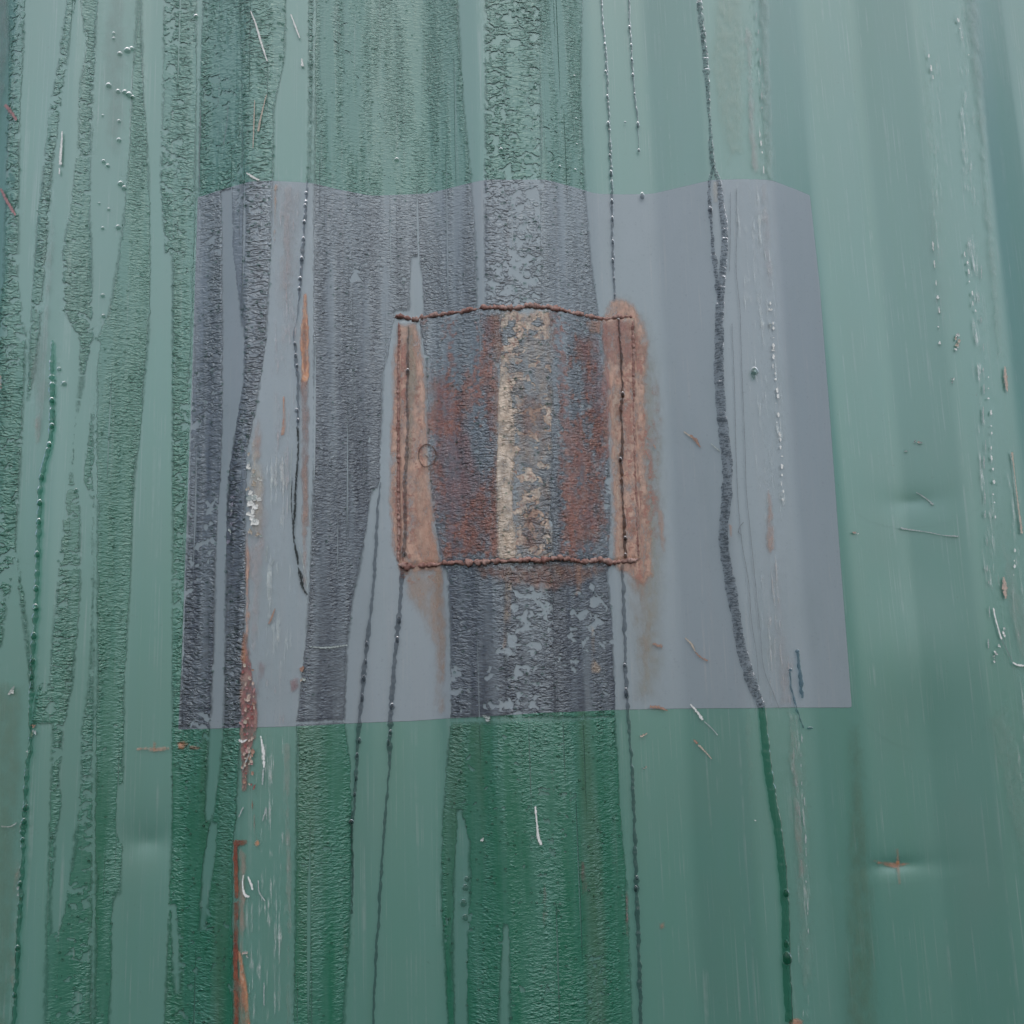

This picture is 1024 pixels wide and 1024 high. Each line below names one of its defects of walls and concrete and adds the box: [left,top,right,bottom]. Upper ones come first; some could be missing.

peeling [226,452,262,544]
rust [300,294,309,520]
rust [390,300,655,590]
rust [240,613,257,791]
rust [233,840,259,1024]